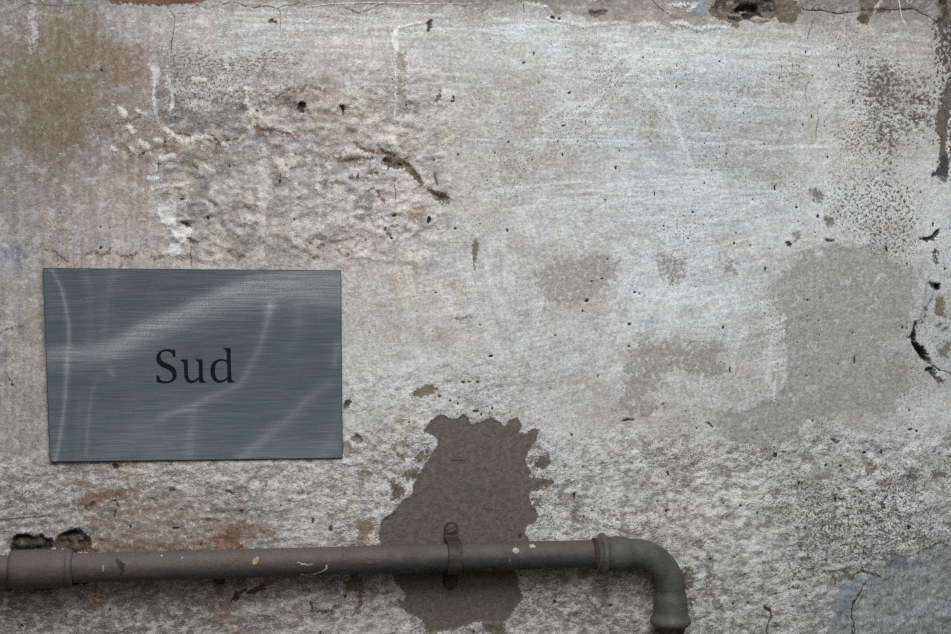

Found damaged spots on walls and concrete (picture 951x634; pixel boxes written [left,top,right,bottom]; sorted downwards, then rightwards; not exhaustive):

peeling [522,0,626,42]
spalling [638,0,803,32]
leakage [822,15,951,259]
crack [908,272,951,384]
spalling [10,527,99,553]